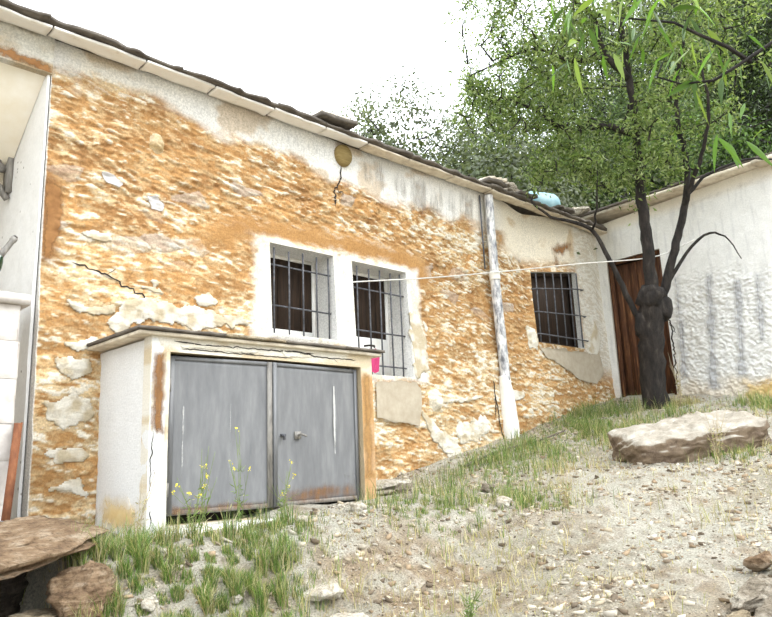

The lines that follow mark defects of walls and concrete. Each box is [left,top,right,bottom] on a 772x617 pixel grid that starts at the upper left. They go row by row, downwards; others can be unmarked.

spalling [102,172,123,188]
crack [73,262,145,298]
flaking render [67,279,248,333]
flaking render [55,336,98,380]
crack [176,341,355,362]
spalling [525,325,539,349]
corrosion [152,354,165,433]
flaking render [42,394,94,430]
flaking render [422,411,491,458]
flaking render [44,448,89,464]
crack [147,433,155,492]
flaking render [48,477,89,498]